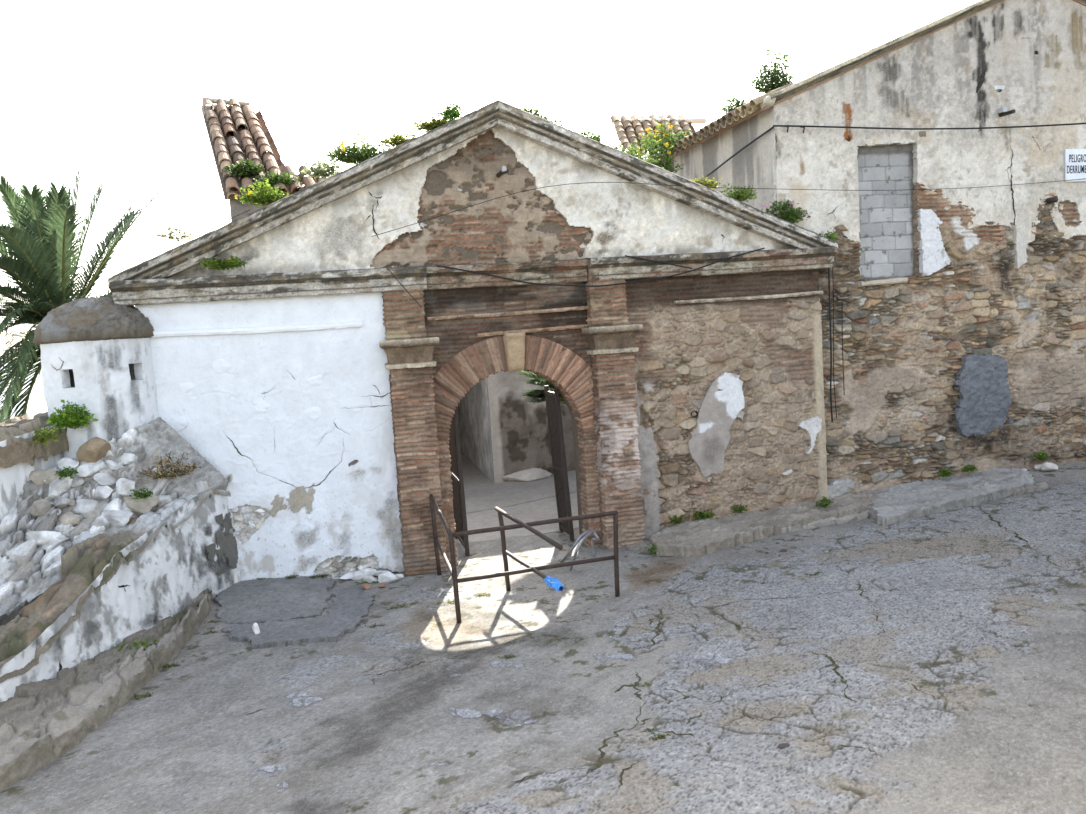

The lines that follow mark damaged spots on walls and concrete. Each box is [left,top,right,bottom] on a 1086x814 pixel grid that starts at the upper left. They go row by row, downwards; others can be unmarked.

leakage [968,3,1022,130]
rust [843,104,852,141]
spalling [370,130,593,268]
spalling [914,183,1082,277]
crack [225,385,390,489]
spalling [206,486,315,576]
crack [350,645,494,685]
crack [648,602,669,649]
crack [709,596,808,633]
crack [814,653,857,702]
crack [834,570,1004,639]
crack [509,673,805,789]